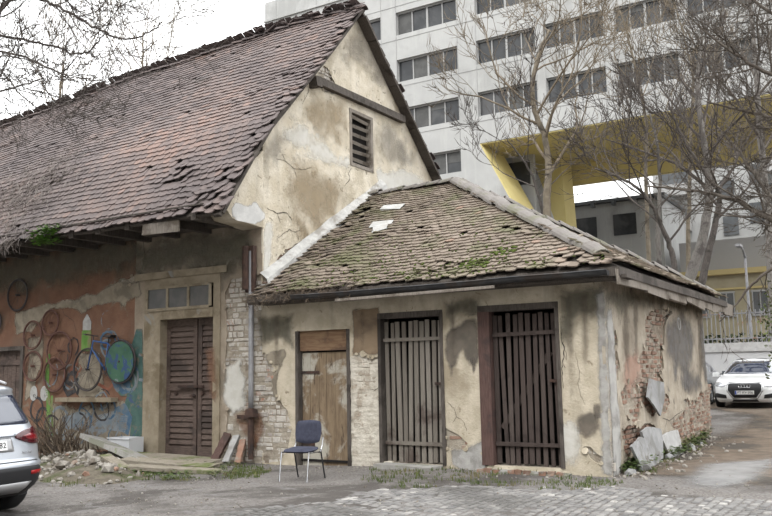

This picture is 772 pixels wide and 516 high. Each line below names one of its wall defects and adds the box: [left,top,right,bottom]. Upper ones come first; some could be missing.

peeling [15,274,141,400]
flaking render [223,223,292,463]
flaking render [350,350,394,466]
leakage [445,300,479,372]
leakage [563,405,601,462]
leakage [560,290,707,390]
flaking render [621,307,670,457]
flaking render [672,384,712,441]